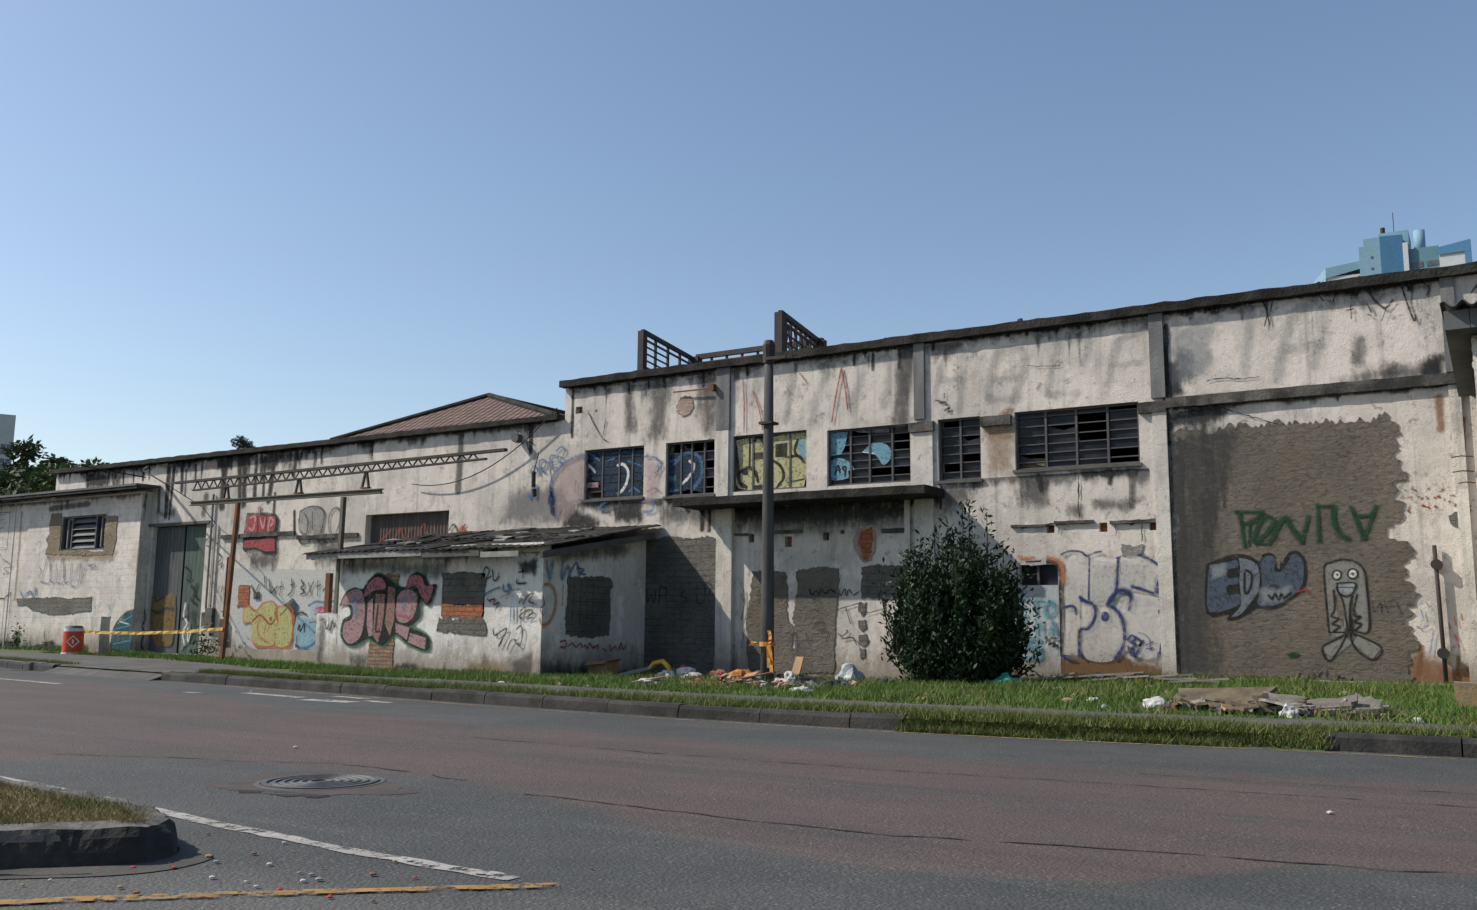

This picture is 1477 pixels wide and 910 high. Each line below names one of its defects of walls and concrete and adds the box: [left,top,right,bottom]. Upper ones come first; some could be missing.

water stain [0,279,1454,678]